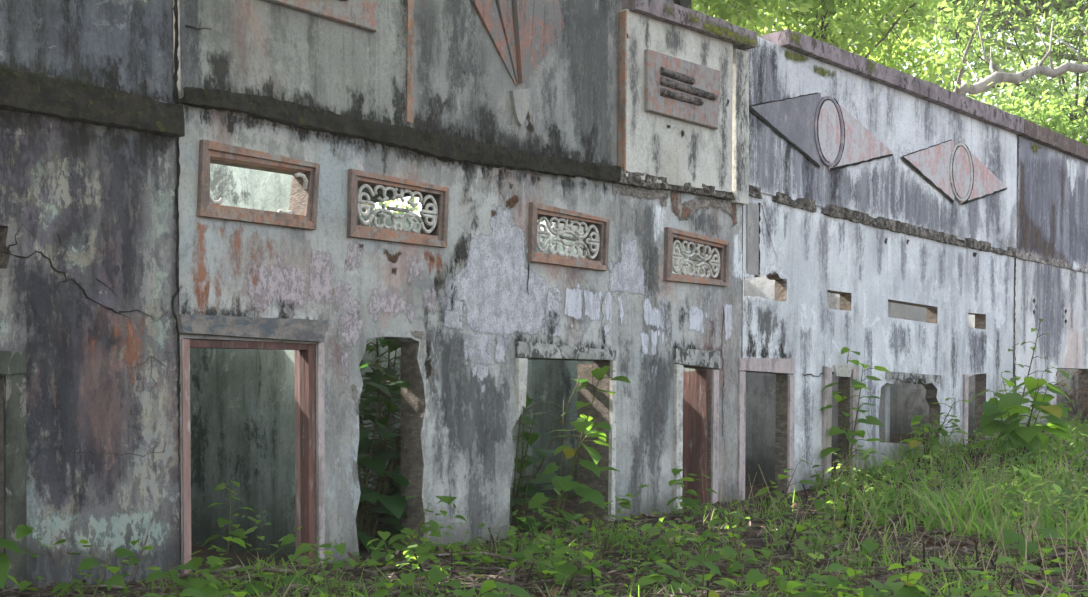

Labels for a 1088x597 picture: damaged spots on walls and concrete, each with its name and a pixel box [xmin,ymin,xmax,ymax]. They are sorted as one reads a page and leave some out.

leakage [9,257,141,510]
leakage [0,111,170,302]
crack [3,138,181,556]
leakage [0,0,276,133]
rust [193,221,275,313]
peeling [247,249,334,311]
leakage [289,125,540,562]
leakage [244,0,613,166]
peeling [338,183,786,487]
leakage [630,20,650,129]
leakage [719,40,1001,279]
leakage [1020,147,1088,368]